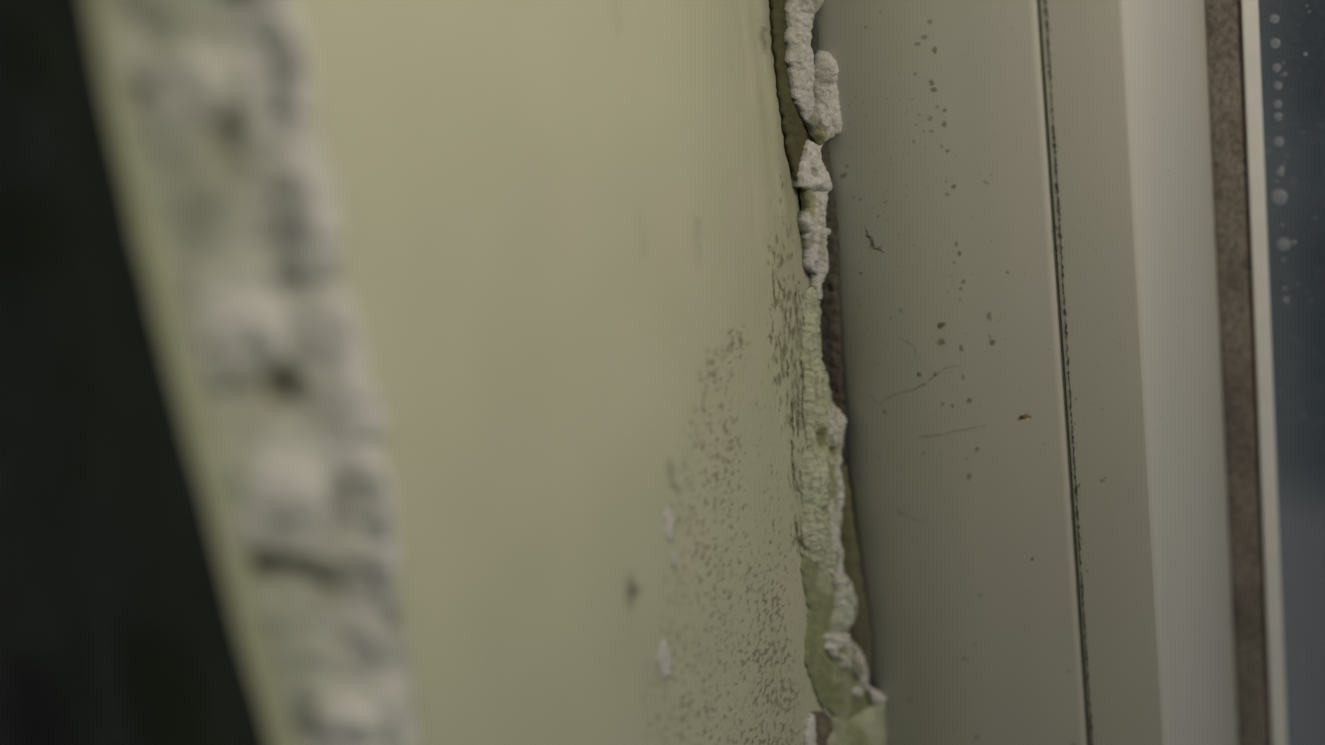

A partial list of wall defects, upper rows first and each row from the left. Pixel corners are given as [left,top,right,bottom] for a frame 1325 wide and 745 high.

flaking render [769,0,843,301]
peeling [800,552,887,745]